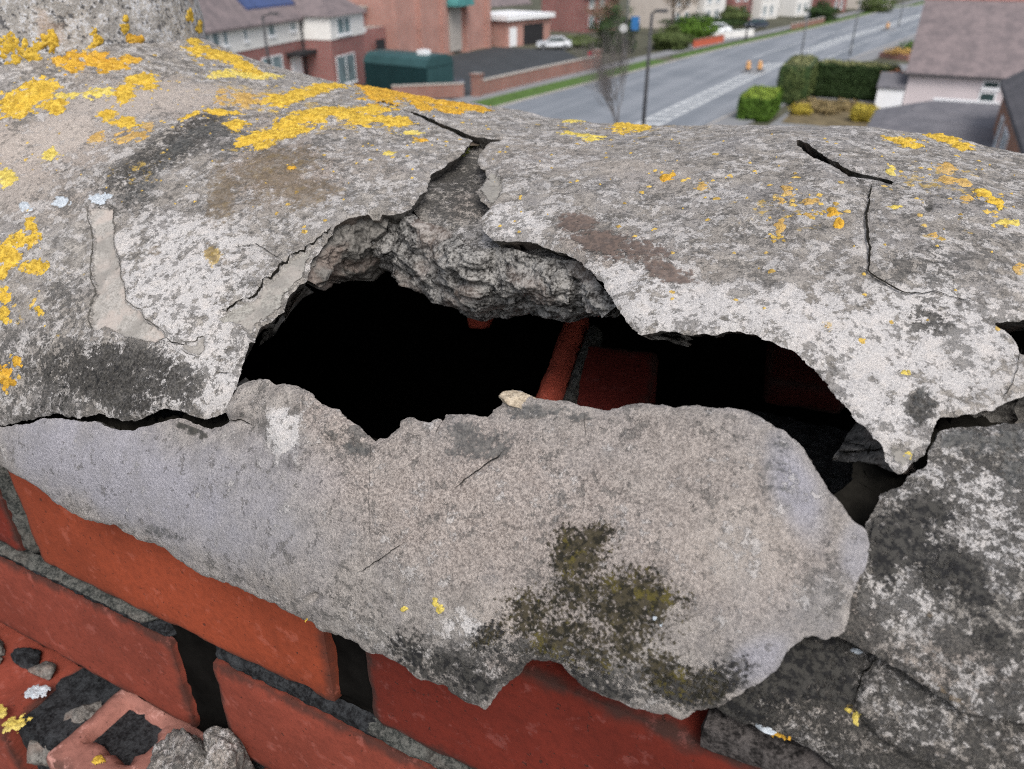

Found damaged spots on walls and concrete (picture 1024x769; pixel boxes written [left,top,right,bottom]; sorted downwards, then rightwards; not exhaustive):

crack [220,226,332,312]
spalling [220,146,621,334]
crack [855,176,969,300]
crack [42,412,252,431]
damp [380,518,867,728]